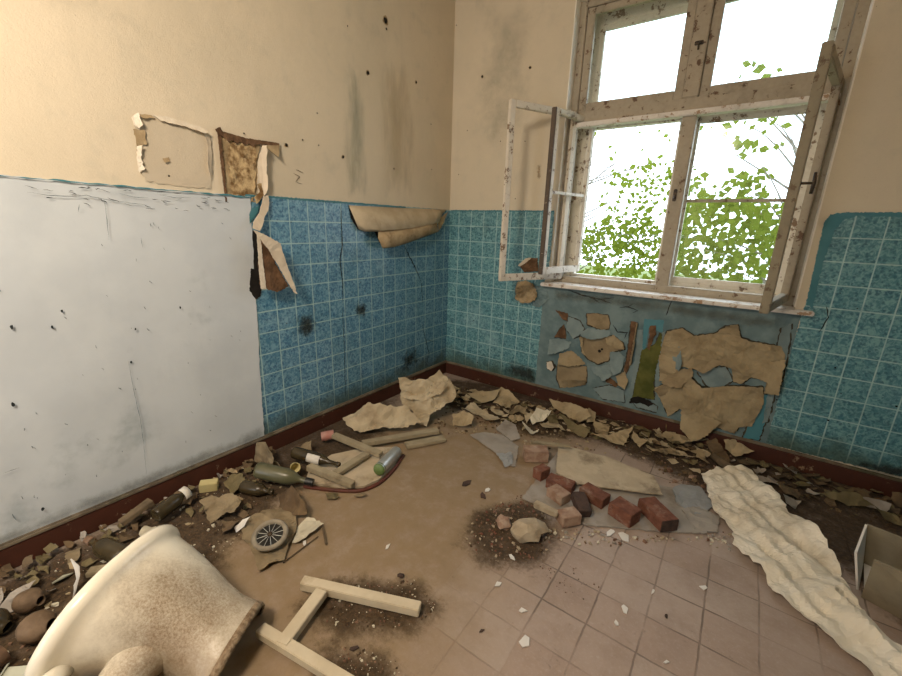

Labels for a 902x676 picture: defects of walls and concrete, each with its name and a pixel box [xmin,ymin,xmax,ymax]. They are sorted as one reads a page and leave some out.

peeling [132,113,214,189]
peeling [546,310,793,442]